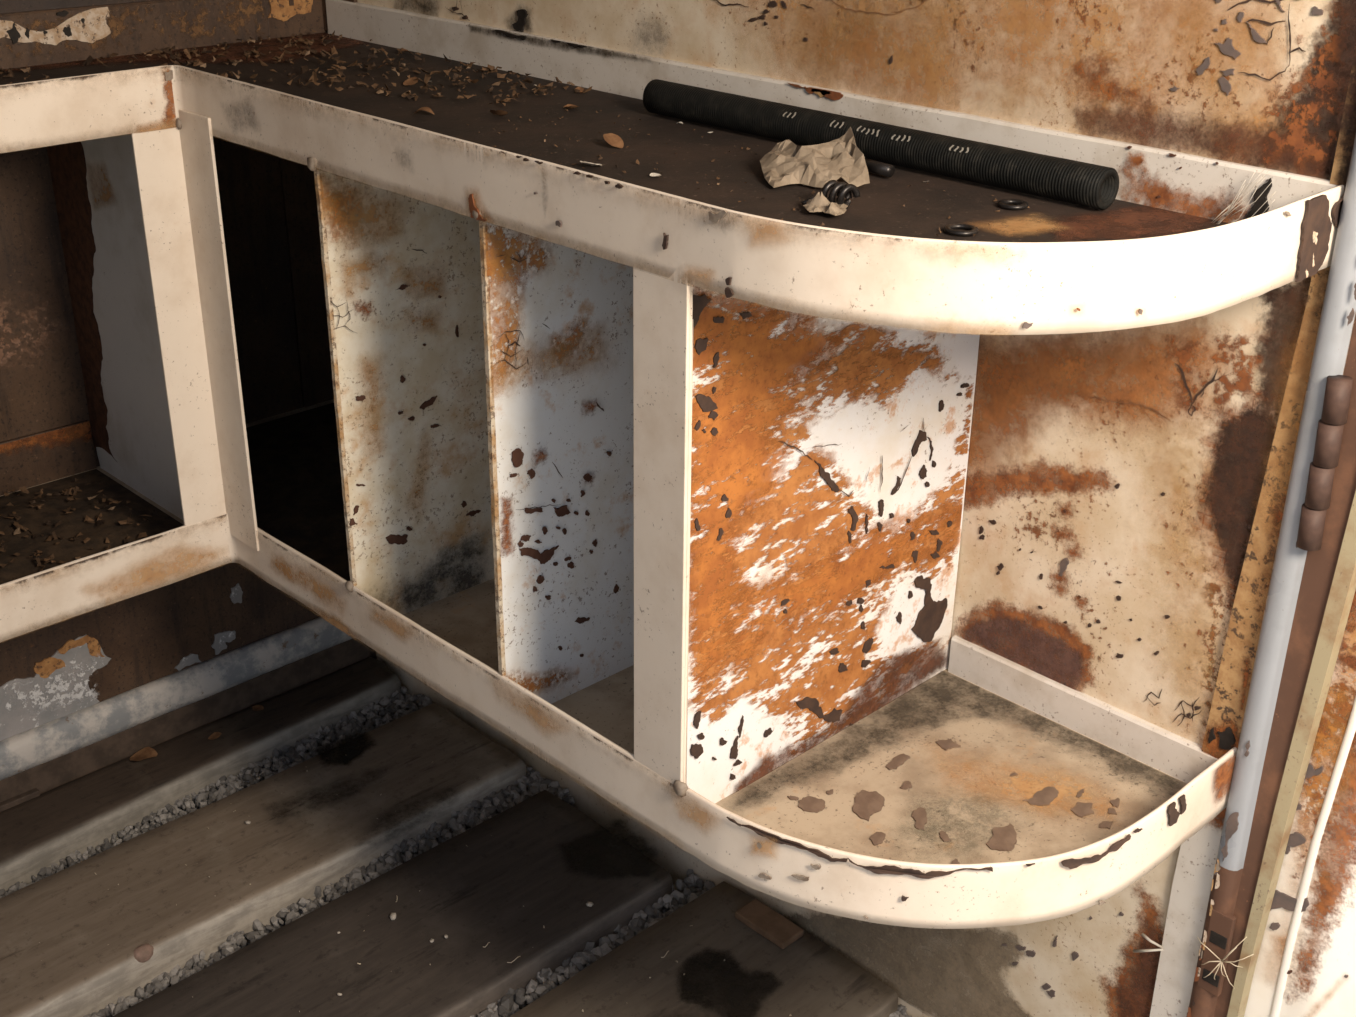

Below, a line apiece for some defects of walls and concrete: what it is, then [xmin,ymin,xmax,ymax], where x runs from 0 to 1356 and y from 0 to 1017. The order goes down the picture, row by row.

peeling [0,7,111,45]
peeling [268,0,313,22]
rust [753,0,1356,223]
rust [954,277,1323,759]
peeling [0,634,111,741]
water stain [561,820,657,877]
rust [1211,808,1226,828]
rust [1282,590,1356,999]
water stain [679,950,781,1017]